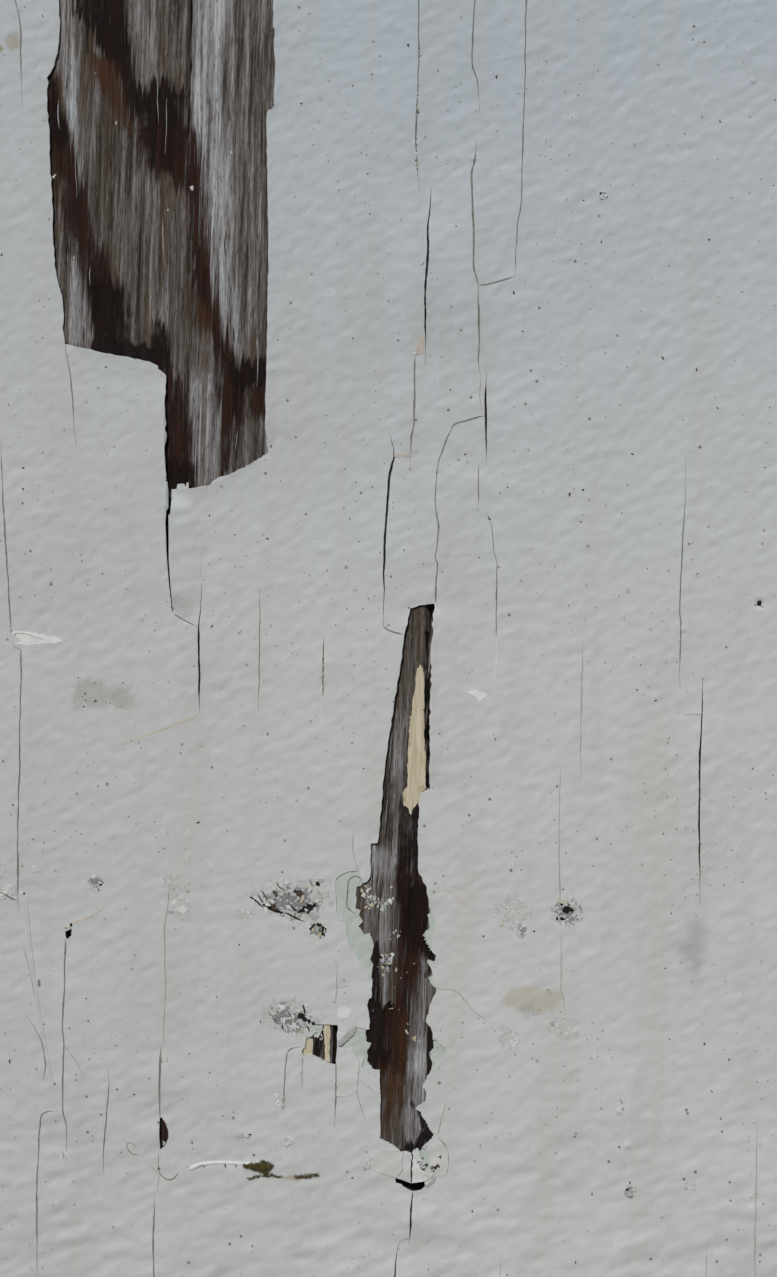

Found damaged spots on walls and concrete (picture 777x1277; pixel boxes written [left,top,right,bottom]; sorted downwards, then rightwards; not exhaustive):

peeling [47,0,275,625]
crack [383,0,527,688]
peeling [233,604,448,1187]
crack [679,467,703,869]
crack [394,1153,413,1277]